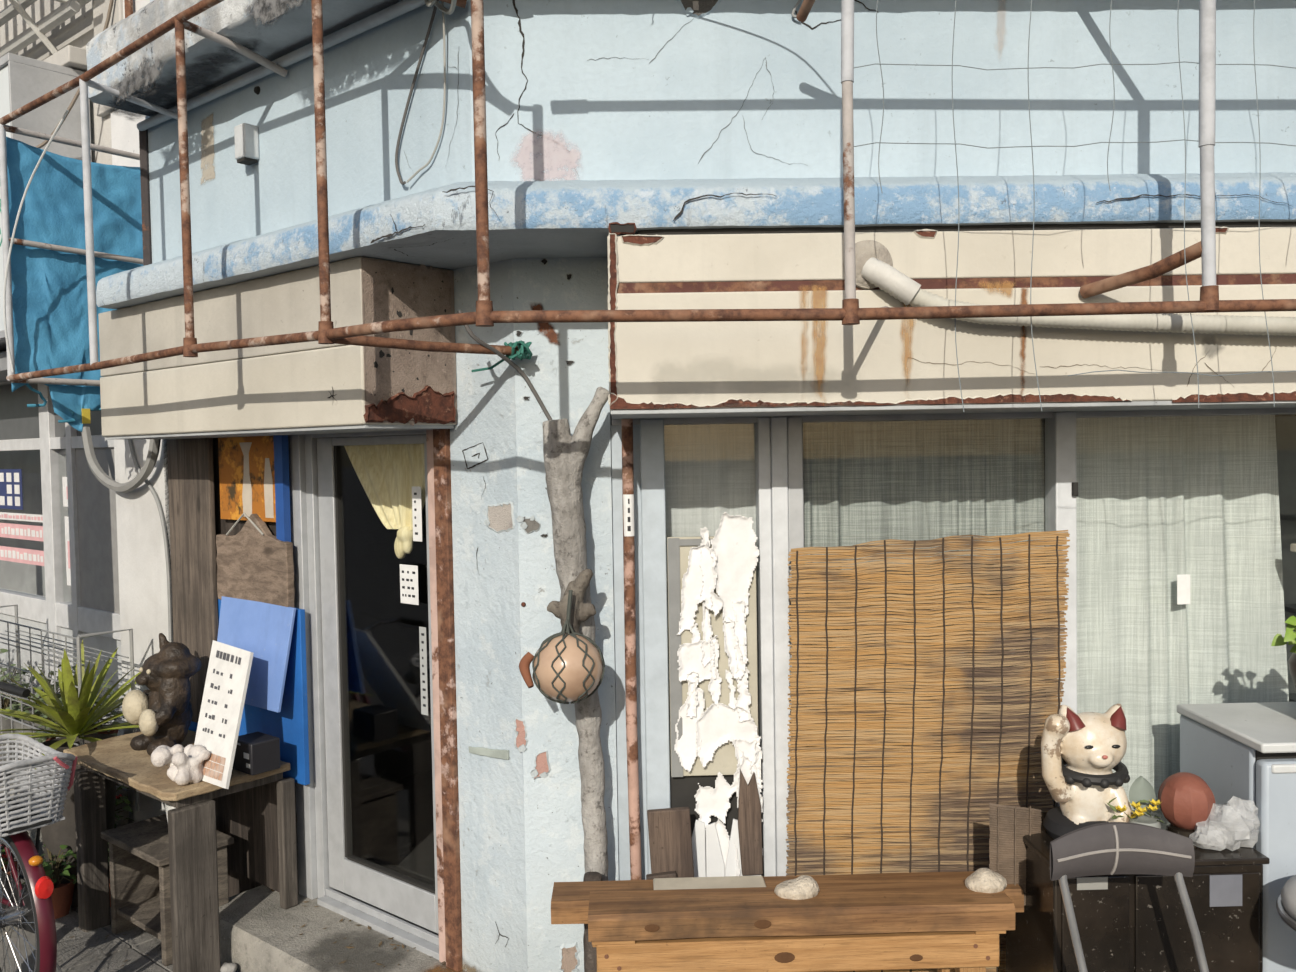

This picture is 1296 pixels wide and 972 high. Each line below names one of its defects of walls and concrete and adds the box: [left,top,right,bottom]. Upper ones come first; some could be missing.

spalling [677,0,722,19]
crack [495,0,579,176]
peeling [514,133,579,181]
crack [673,193,775,221]
crack [1097,194,1294,207]
crack [371,216,447,258]
spalling [362,259,454,406]
corrosion [608,233,1132,409]
crack [912,354,1235,388]
corrosion [1172,390,1296,402]
peeling [484,501,548,538]
peeling [514,717,551,780]